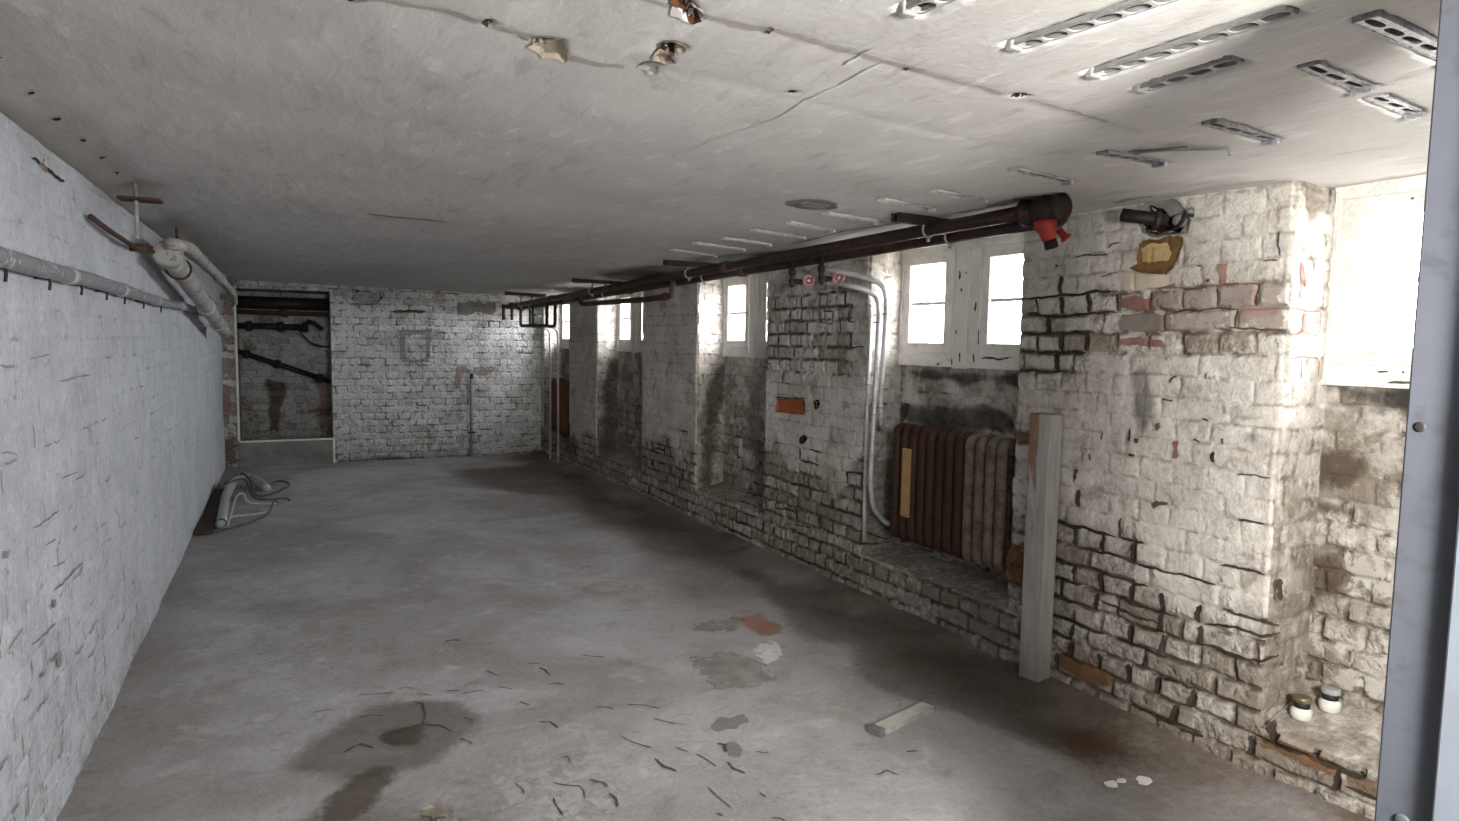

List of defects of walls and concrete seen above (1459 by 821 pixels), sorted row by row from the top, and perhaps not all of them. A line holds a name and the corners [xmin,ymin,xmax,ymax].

peeling [937,199,1322,373]
leakage [915,370,1019,387]
leakage [699,366,725,487]
leakage [900,404,1014,432]
peeling [1073,432,1103,507]
spalling [1172,438,1224,462]
leakage [1319,453,1364,486]
leakage [1313,494,1400,600]
peeling [1221,564,1283,601]
peeling [1052,518,1216,737]
peeling [1194,605,1280,663]
leakage [1332,664,1384,700]